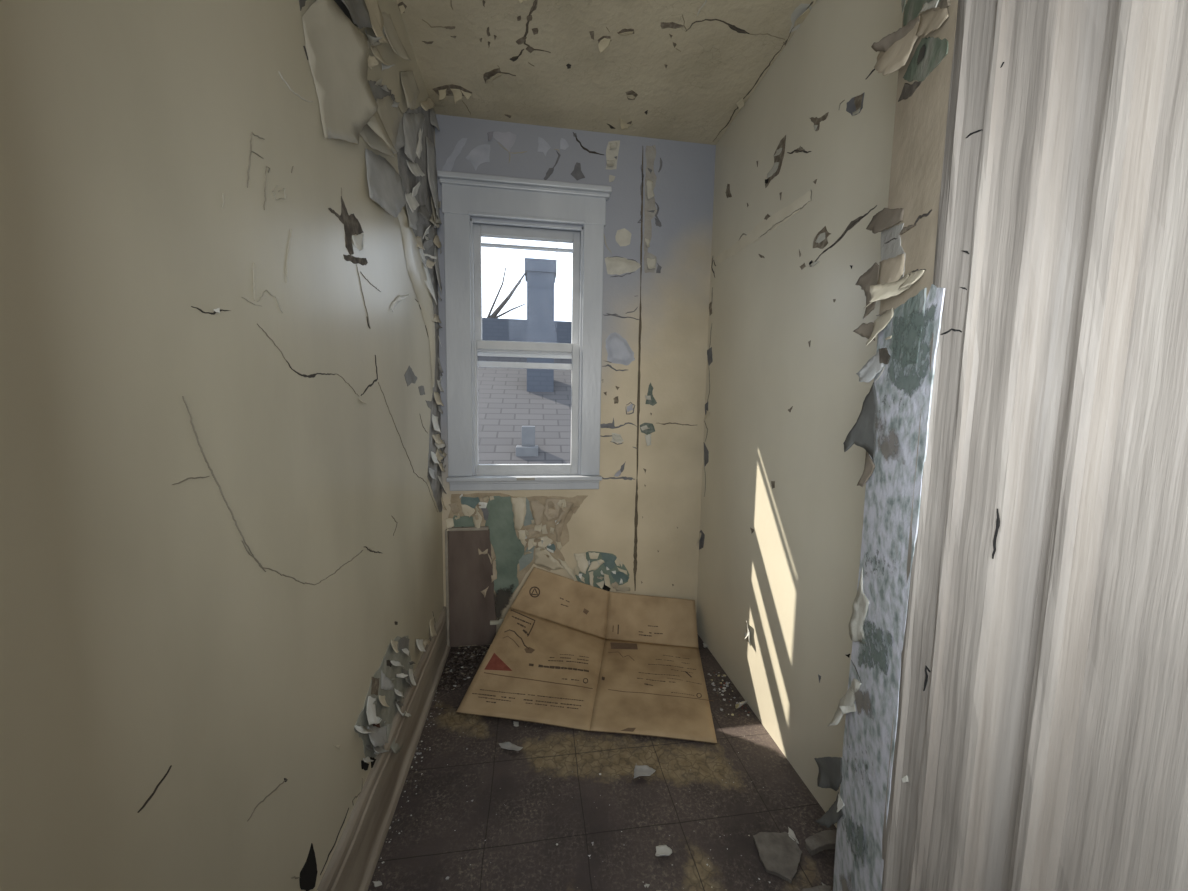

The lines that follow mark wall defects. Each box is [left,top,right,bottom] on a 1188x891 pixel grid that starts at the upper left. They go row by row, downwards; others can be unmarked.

crack [510,0,551,66]
peeling [871,0,950,102]
peeling [810,92,865,131]
crack [247,132,294,210]
crack [800,205,877,270]
peeling [299,0,646,597]
crack [192,290,438,512]
peeling [600,382,657,449]
crack [602,150,695,590]
crack [172,396,398,585]
peeling [354,614,437,771]
spalling [292,843,318,891]